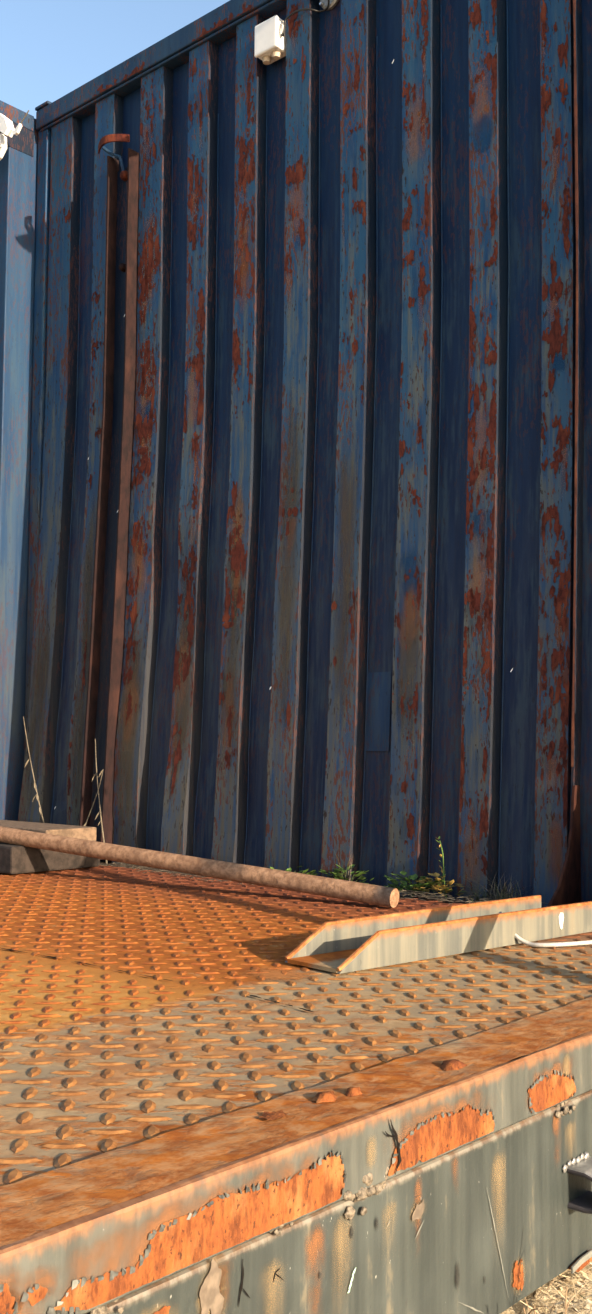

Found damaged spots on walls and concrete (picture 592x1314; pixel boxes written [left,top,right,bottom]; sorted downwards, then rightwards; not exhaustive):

rust [469,0,497,120]
rust [93,62,161,493]
rust [182,154,206,464]
rust [234,64,255,299]
rust [539,0,579,834]
rust [121,516,150,724]
rust [222,481,247,638]
rust [284,154,592,972]
rust [167,722,182,795]
rust [259,1110,288,1120]
rust [311,1087,362,1103]